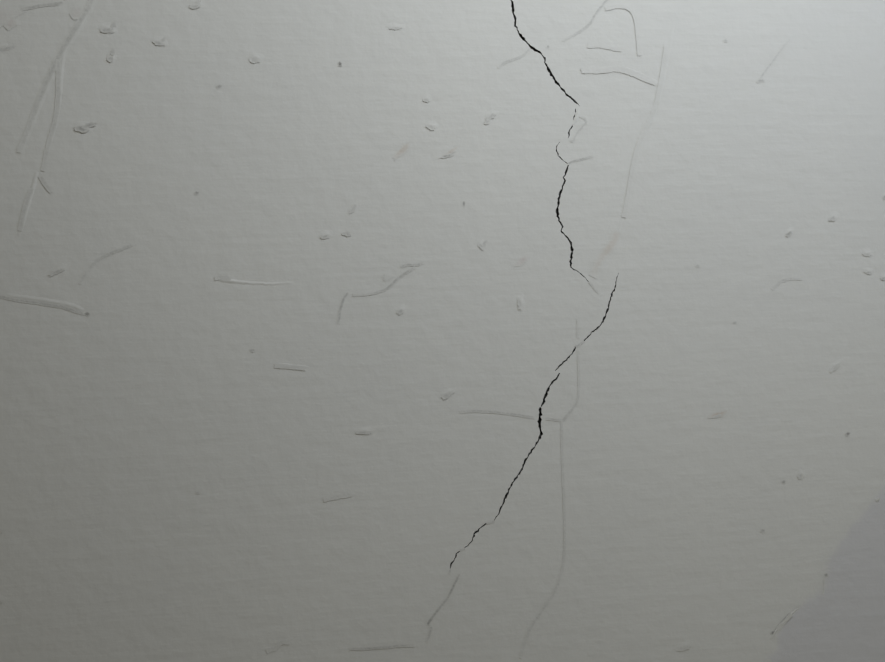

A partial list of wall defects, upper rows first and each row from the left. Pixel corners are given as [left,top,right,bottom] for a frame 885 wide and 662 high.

crack [337,0,619,658]